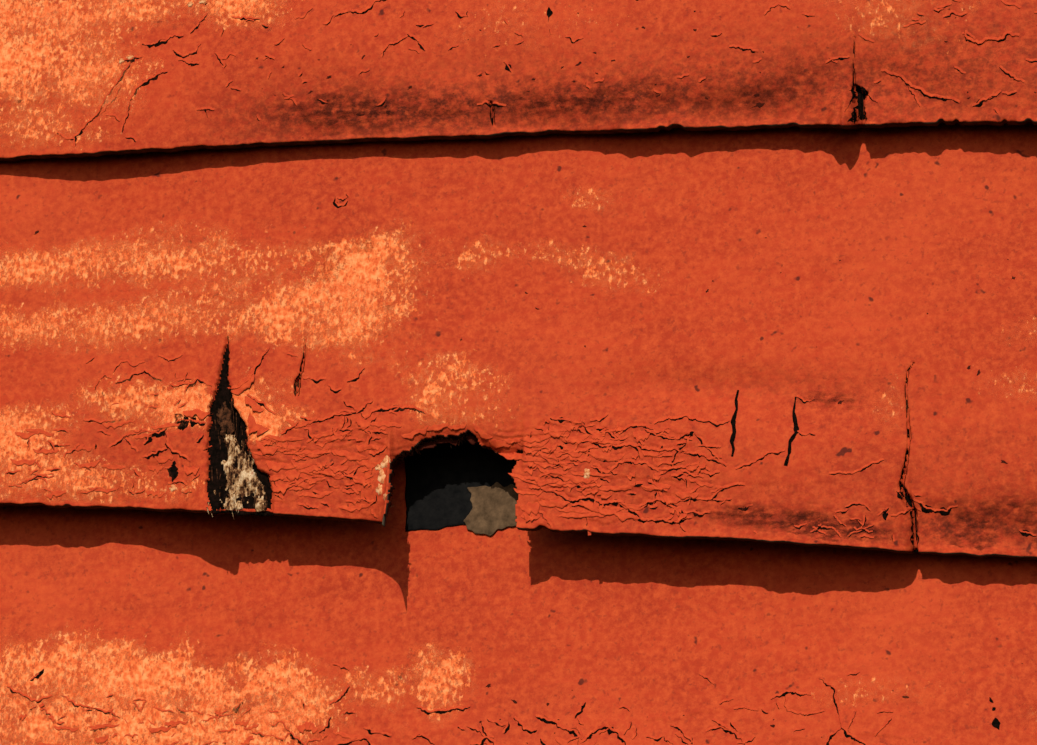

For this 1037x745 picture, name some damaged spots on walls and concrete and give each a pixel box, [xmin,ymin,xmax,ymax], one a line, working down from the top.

crack [825,0,1037,126]
peeling [10,428,59,466]
crack [5,342,427,519]
spalling [134,336,714,523]
crack [524,390,816,535]
crack [794,362,958,553]
peeling [39,702,120,744]
peeling [147,720,188,745]
peeling [234,718,259,745]